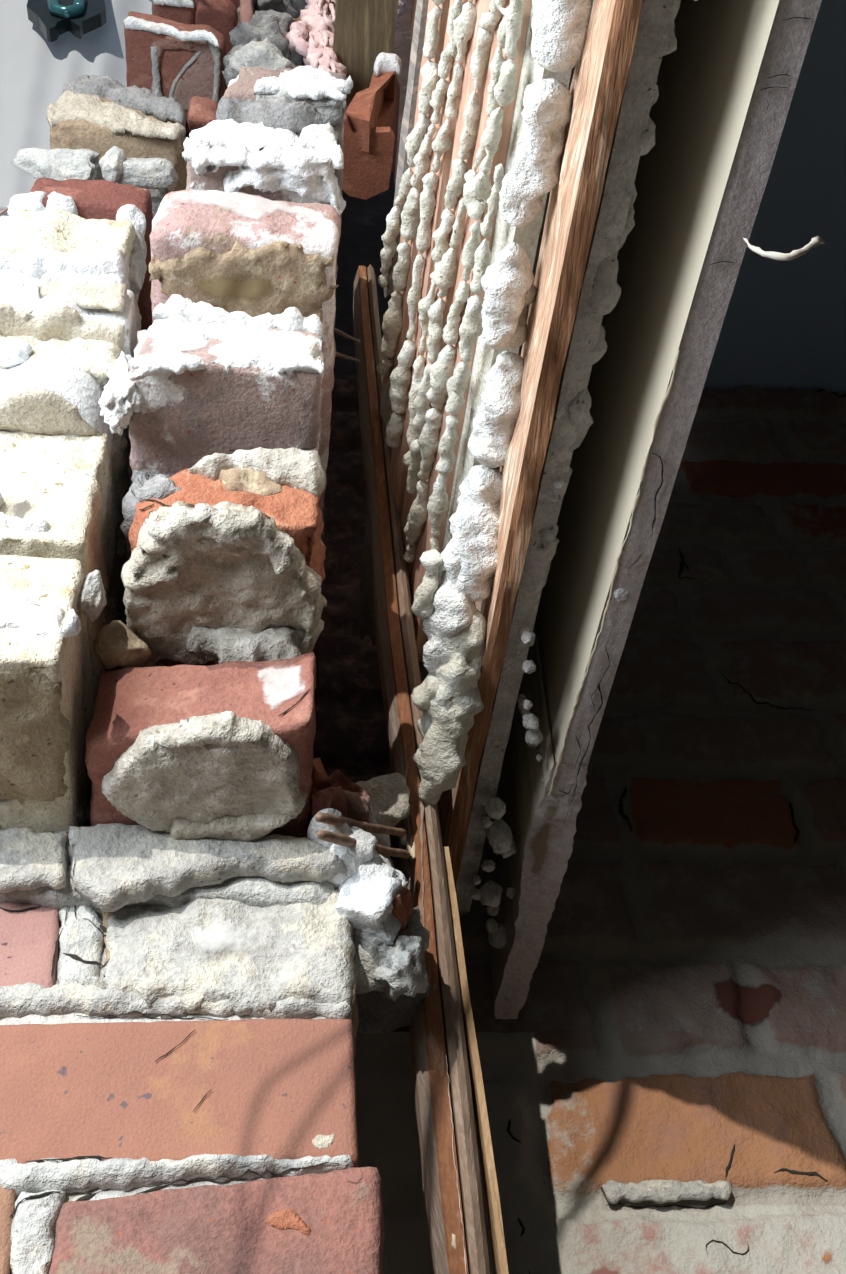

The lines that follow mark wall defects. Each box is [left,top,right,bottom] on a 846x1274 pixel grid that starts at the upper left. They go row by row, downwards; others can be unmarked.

crack [628,452,695,579]
crack [559,630,612,823]
crack [76,1011,229,1062]
crack [608,1144,735,1209]
crack [774,1168,828,1181]
crack [706,1239,749,1255]